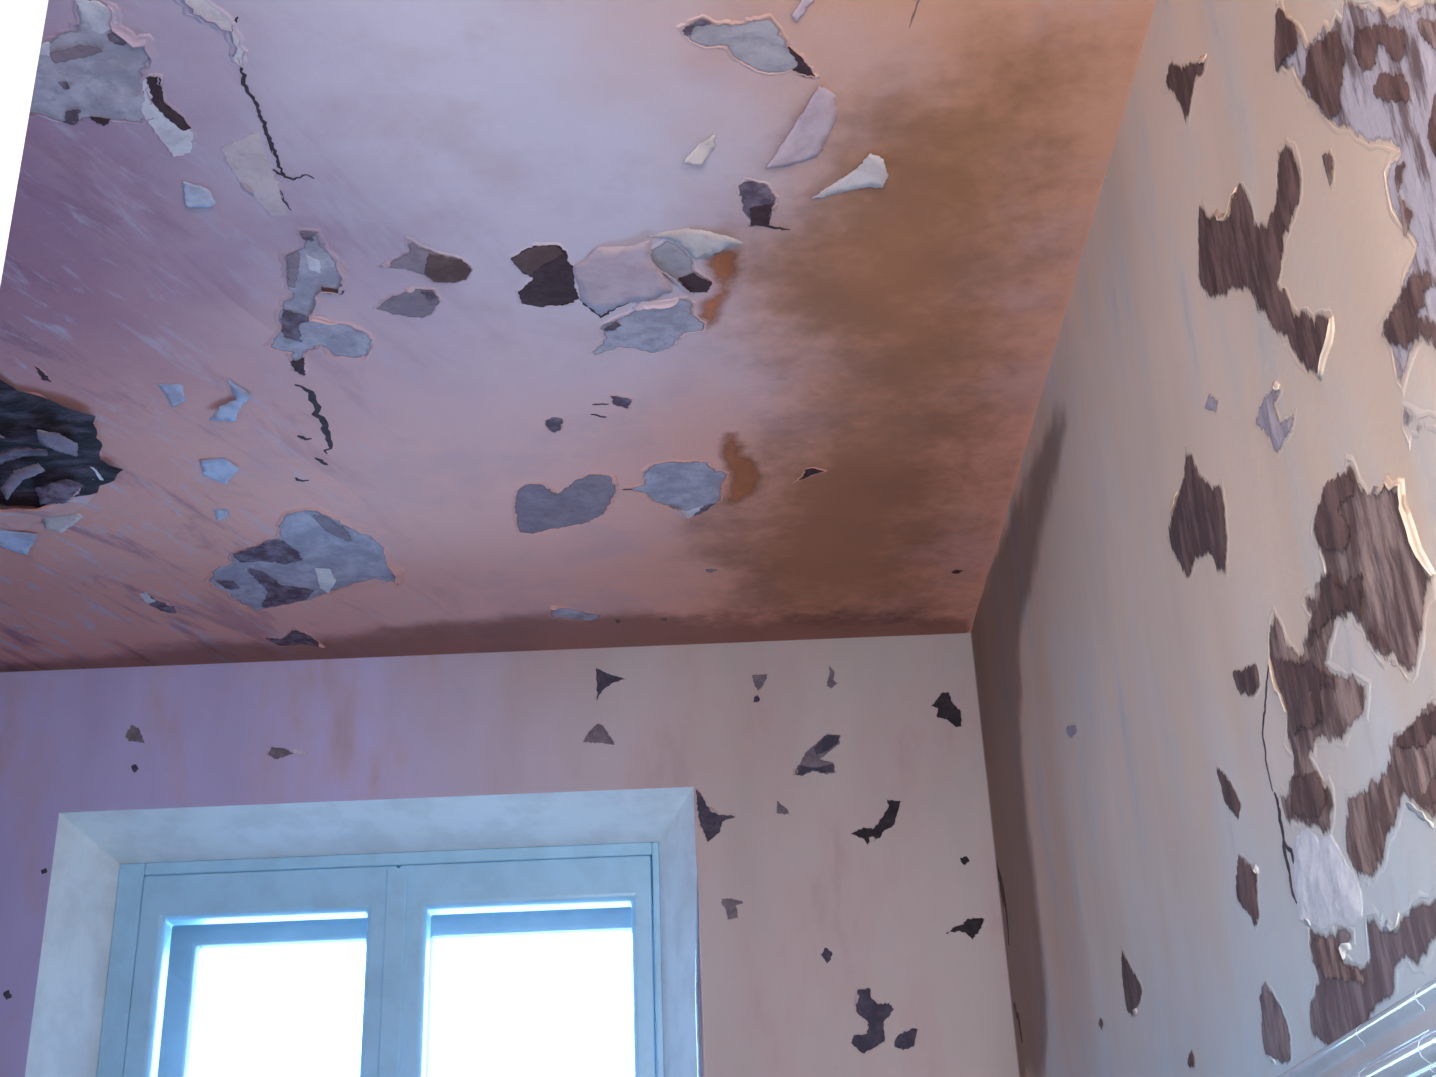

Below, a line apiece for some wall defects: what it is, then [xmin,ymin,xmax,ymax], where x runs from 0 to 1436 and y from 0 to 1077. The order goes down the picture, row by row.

peeling [29,0,198,159]
crack [232,16,314,211]
peeling [508,228,744,357]
peeling [1197,136,1335,382]
peeling [1272,0,1436,451]
peeling [204,508,405,612]
crack [294,384,333,482]
peeling [510,459,730,535]
peeling [1167,446,1229,585]
peeling [1232,453,1436,888]
peeling [849,986,919,1055]
peeling [1303,883,1436,1049]